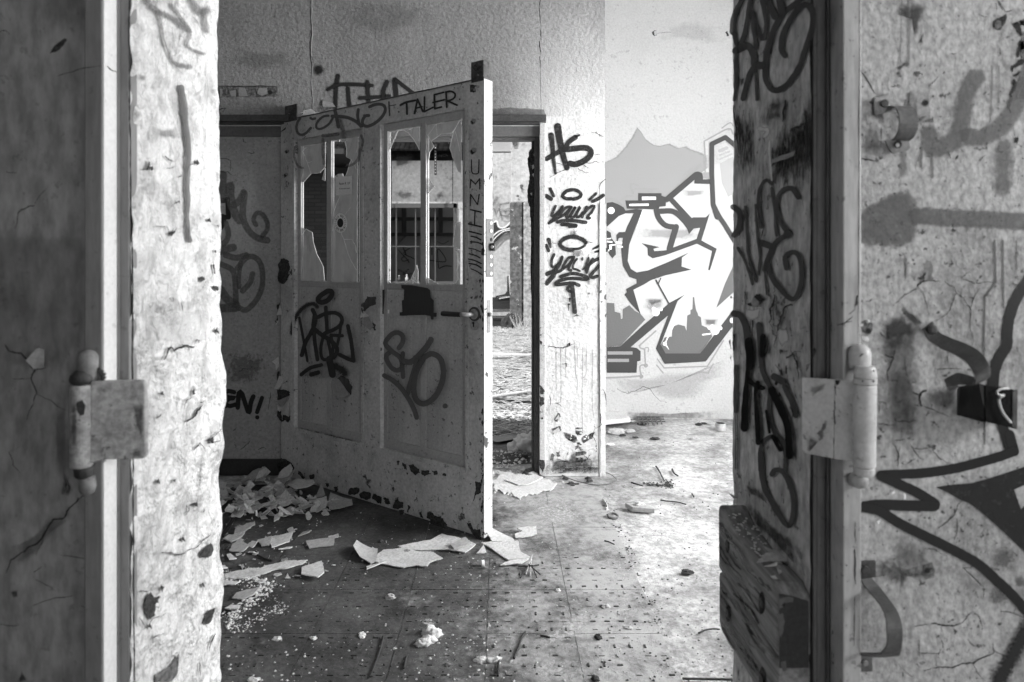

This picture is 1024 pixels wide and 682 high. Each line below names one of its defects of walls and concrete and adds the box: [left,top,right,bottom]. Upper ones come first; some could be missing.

crack [896,263,984,344]
crack [5,344,63,418]
peeling [277,458,447,528]
crack [6,496,85,607]
spalling [200,543,214,558]
peeling [467,523,481,540]
spalling [139,585,166,629]
spalling [201,608,216,651]
spalling [155,654,179,682]